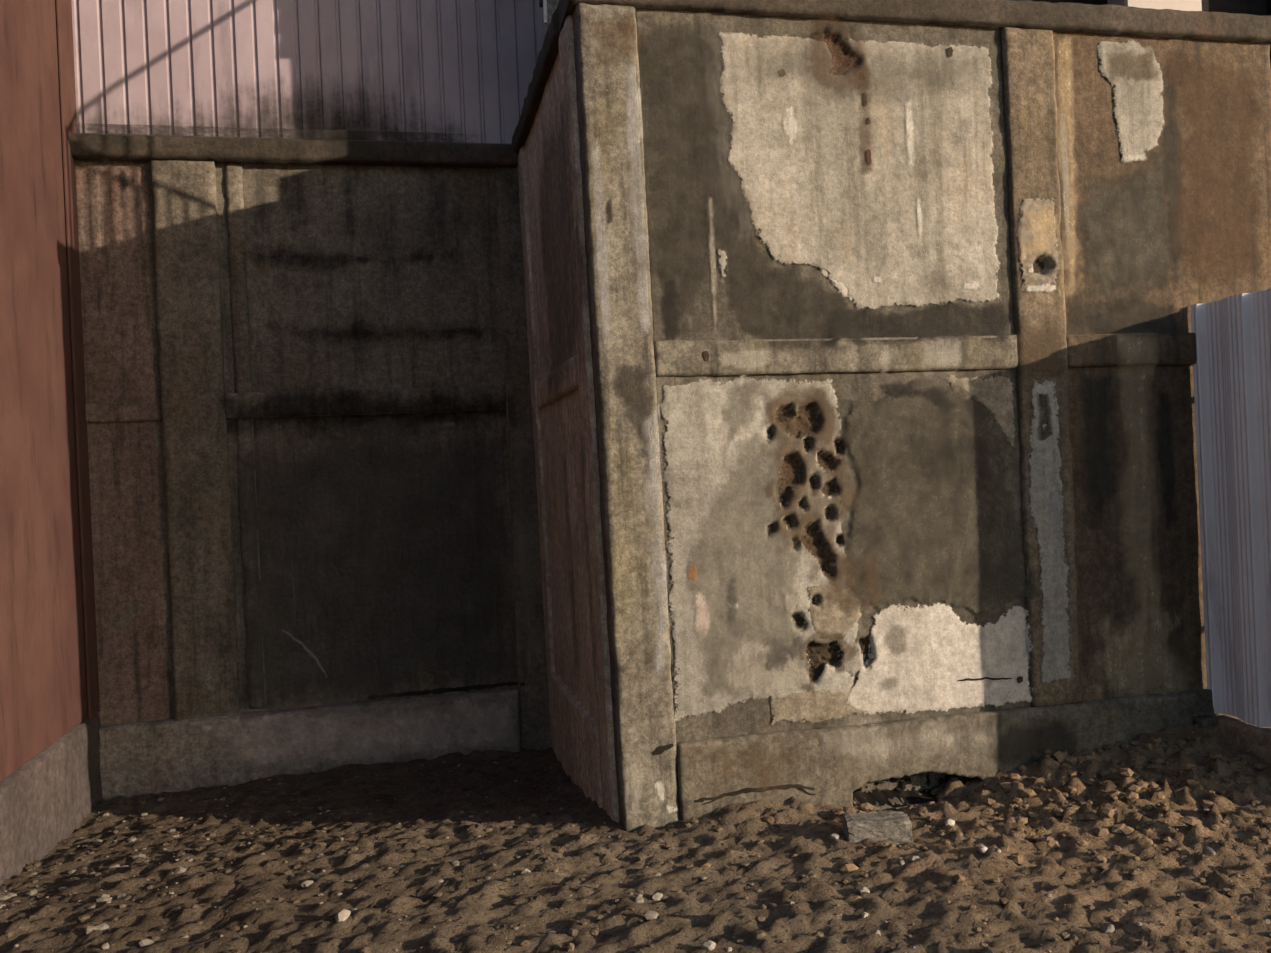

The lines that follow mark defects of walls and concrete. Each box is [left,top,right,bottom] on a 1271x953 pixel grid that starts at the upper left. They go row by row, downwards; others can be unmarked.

leakage [627,26,1039,614]
peeling [717,30,1001,310]
rust [859,71,871,169]
spalling [1016,197,1060,292]
leakage [1069,71,1182,336]
peeling [1097,39,1164,162]
leakage [692,438,808,695]
peeling [660,374,1072,726]
crack [694,784,815,806]